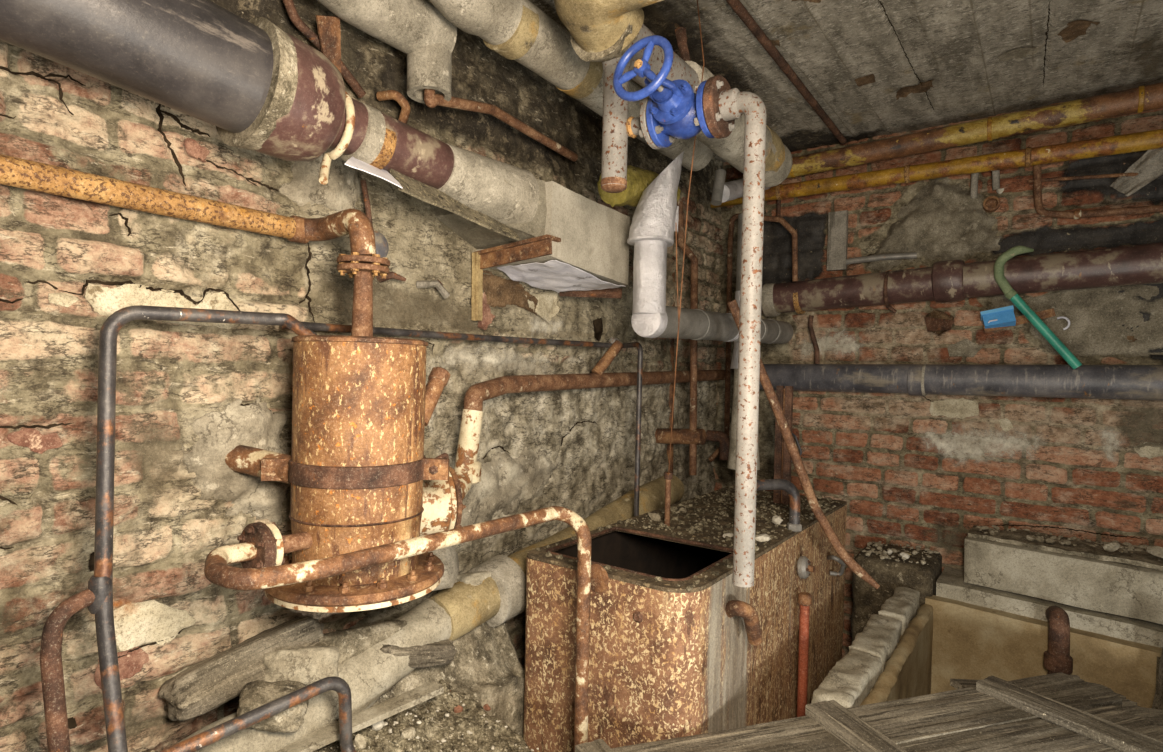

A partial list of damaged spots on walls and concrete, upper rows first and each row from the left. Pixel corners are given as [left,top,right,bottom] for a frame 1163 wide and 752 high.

crack [1042,2,1050,87]
crack [0,66,86,115]
water stain [721,63,754,93]
crack [156,104,280,192]
crack [0,280,240,311]
spalling [48,283,236,329]
spalling [989,282,1163,357]
spalling [7,428,63,454]
crack [0,422,72,430]
spalling [929,398,979,419]
spalling [1134,442,1163,459]
spalling [113,600,196,681]